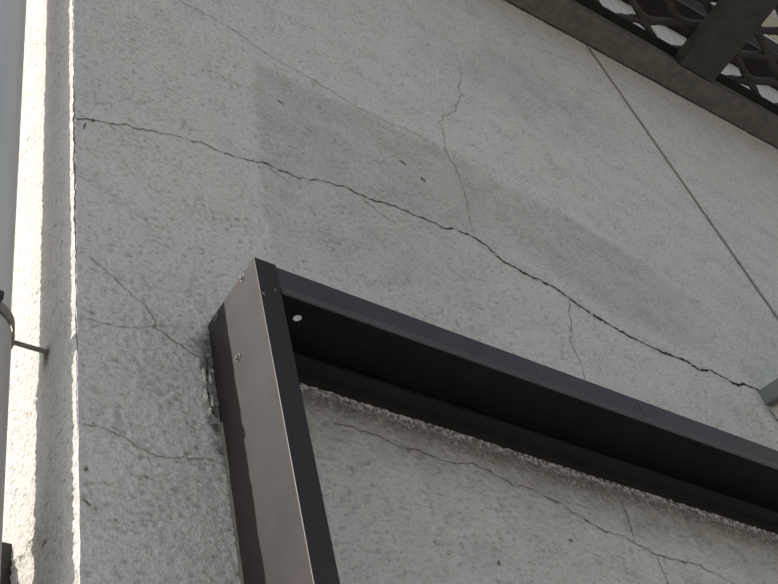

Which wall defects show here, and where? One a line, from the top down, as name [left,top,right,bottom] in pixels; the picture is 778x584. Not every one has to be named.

crack [72,1,778,460]
crack [325,421,725,584]